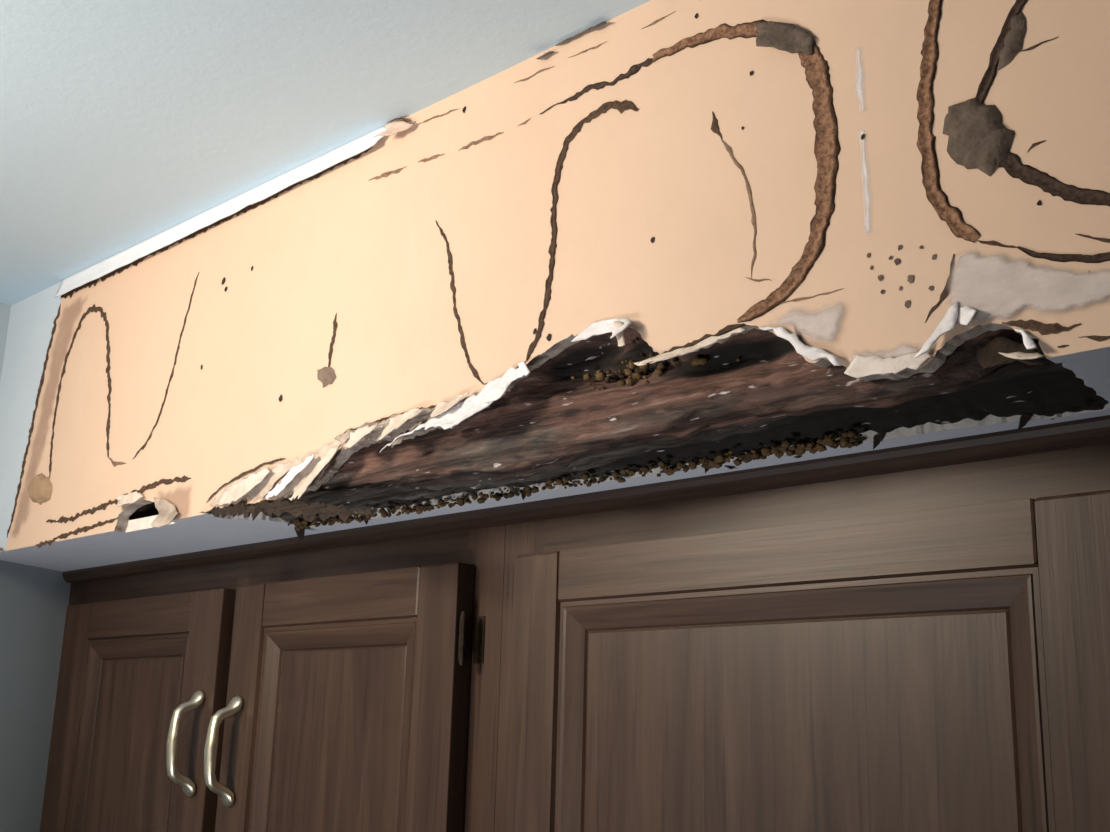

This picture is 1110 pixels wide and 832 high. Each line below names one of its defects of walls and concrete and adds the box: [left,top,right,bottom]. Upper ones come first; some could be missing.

crack [388,108,460,124]
crack [514,41,607,83]
crack [642,11,675,29]
crack [7,147,373,537]
crack [435,220,487,385]
crack [515,100,639,369]
spalling [199,252,1110,544]
crack [711,111,844,345]
crack [36,475,191,548]
spalling [116,491,179,528]